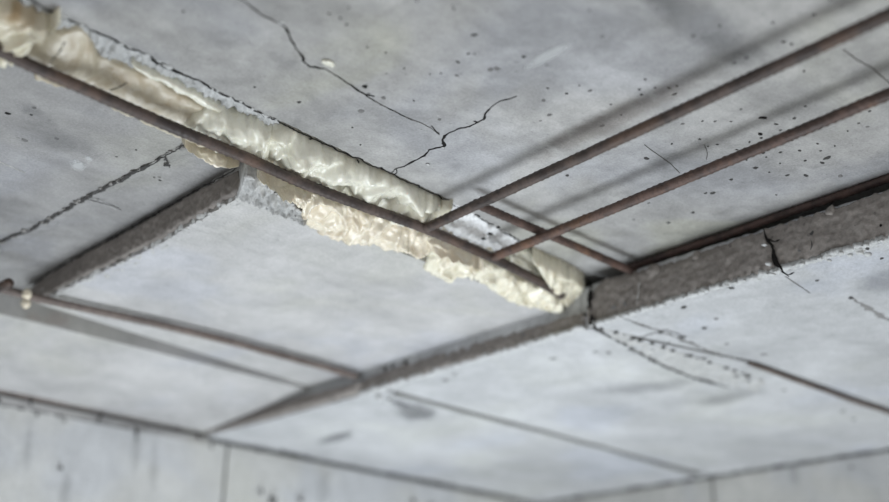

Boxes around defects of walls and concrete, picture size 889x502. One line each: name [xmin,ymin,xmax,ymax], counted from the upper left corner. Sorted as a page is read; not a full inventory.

crack [21,0,531,248]
spalling [358,224,889,414]